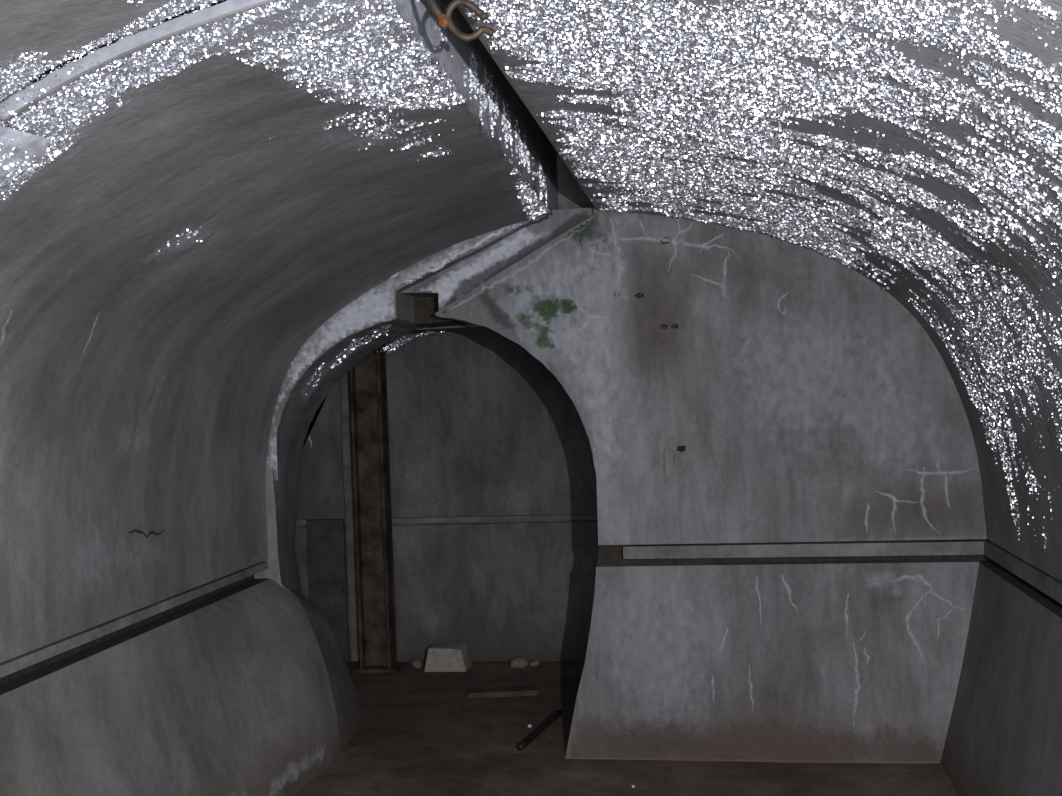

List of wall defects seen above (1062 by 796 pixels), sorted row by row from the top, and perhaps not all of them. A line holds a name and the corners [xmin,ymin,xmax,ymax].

crack [589,217,729,299]
damp [280,214,623,474]
crack [865,458,972,529]
crack [893,575,967,659]